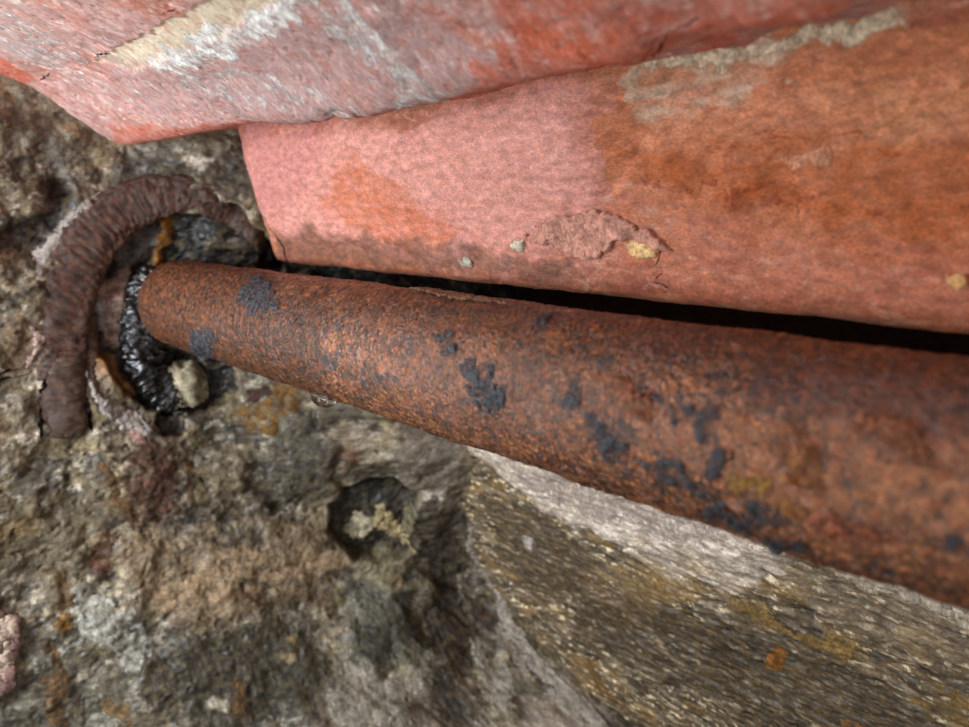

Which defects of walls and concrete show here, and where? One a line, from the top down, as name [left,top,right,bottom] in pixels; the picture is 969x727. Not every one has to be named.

spalling [590,8,969,254]
peeling [523,209,671,261]
corrosion [409,287,506,304]
crack [0,368,47,438]
corrosion [231,382,300,436]
corrosion [98,429,196,533]
corrosion [88,529,115,580]